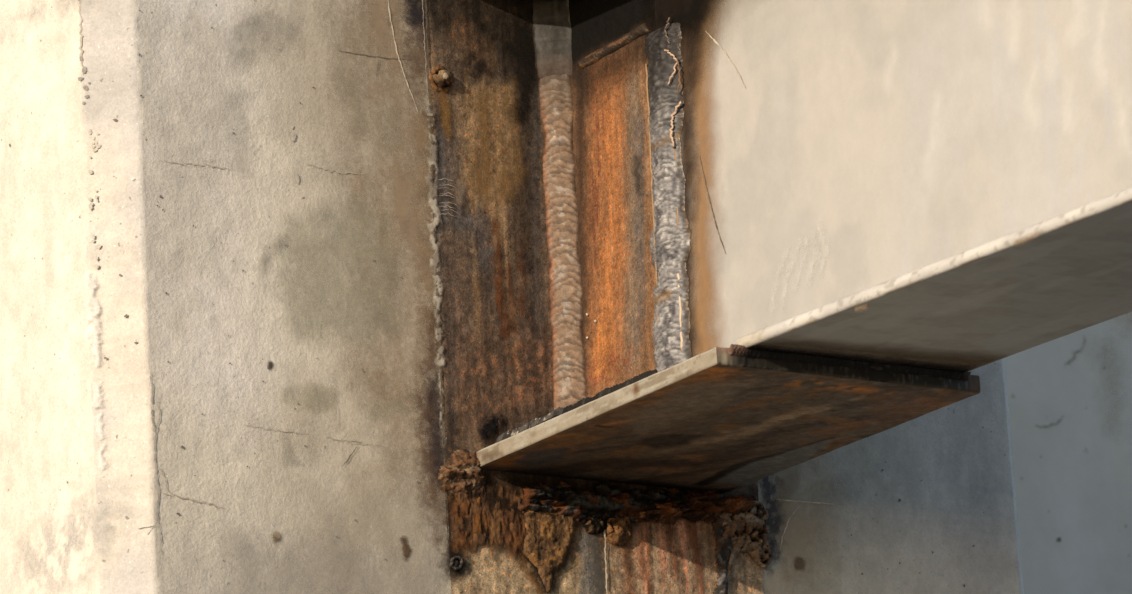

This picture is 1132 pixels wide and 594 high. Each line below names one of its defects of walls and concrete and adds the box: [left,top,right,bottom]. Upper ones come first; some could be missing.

water stain [354,0,449,543]
crack [139,365,222,555]
corrosion [438,449,823,594]